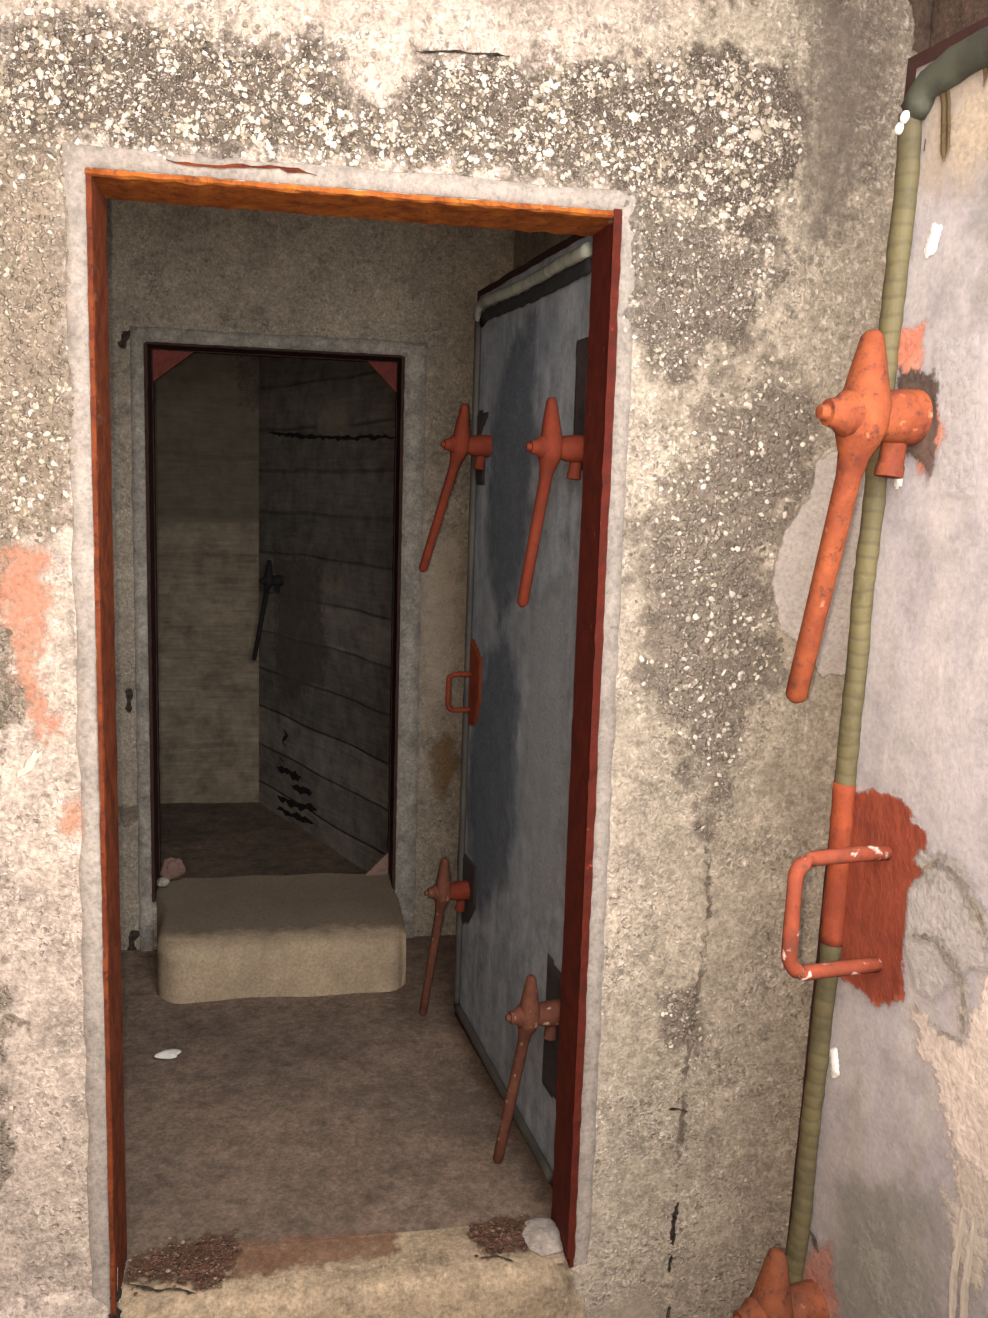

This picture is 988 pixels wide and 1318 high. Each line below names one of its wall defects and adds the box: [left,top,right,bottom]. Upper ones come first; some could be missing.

spalling [0,0,838,841]
rust [0,546,57,738]
peeling [816,472,865,677]
spalling [655,985,703,1052]
crack [667,832,712,1273]
peeling [910,975,988,1318]
crack [108,1286,122,1318]